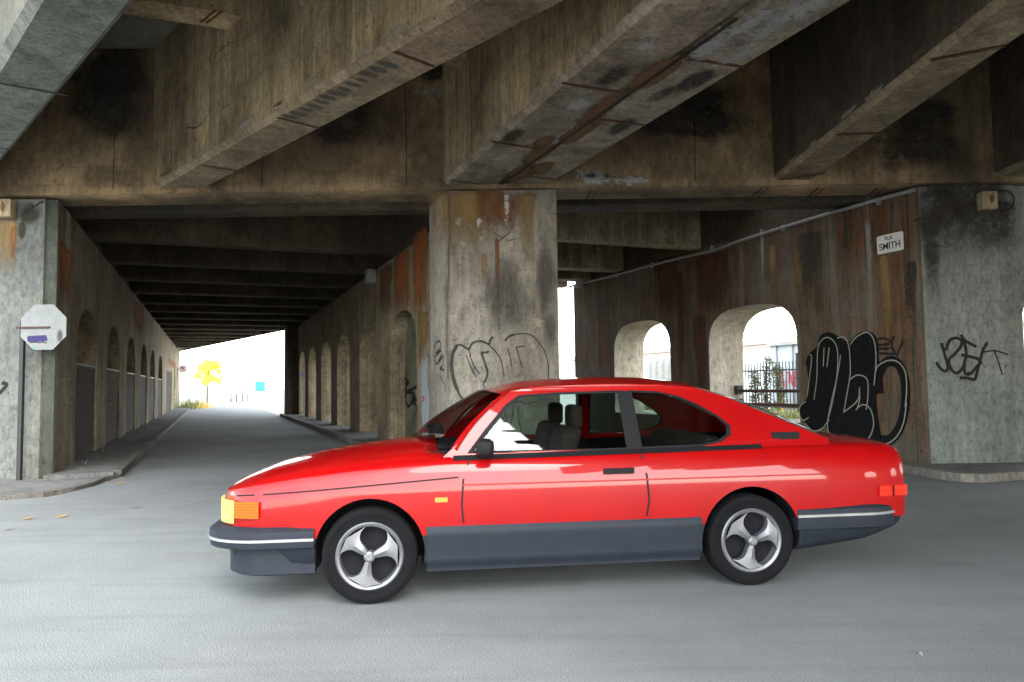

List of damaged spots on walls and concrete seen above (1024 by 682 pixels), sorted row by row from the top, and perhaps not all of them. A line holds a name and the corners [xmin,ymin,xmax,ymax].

damp [611,0,830,138]
rust [432,55,745,244]
damp [867,99,960,164]
rust [482,239,519,323]
crack [493,223,518,308]